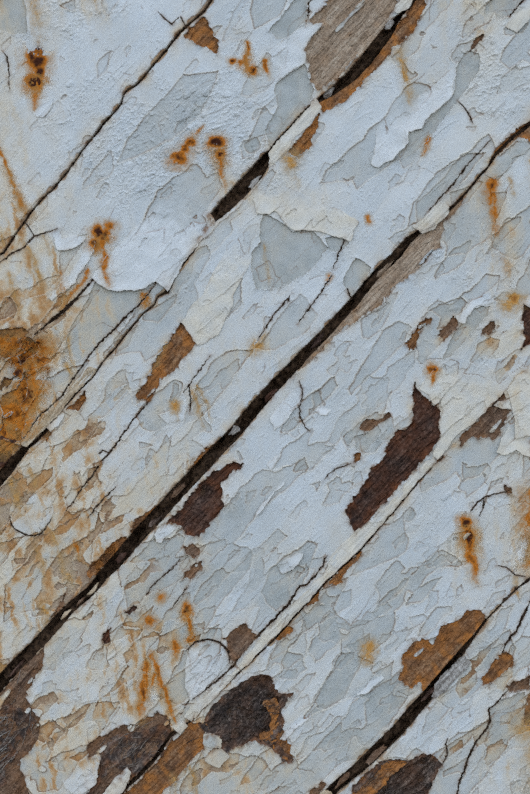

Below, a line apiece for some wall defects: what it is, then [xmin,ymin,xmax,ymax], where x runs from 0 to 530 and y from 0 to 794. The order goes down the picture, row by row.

corrosion [23,49,49,111]
peeling [255,0,426,156]
corrosion [88,221,115,285]
corrosion [0,334,55,454]
crack [10,402,148,537]
crack [27,279,157,433]
peeling [154,462,244,579]
crack [185,557,326,705]
peeling [345,292,530,531]
corrosion [457,515,480,580]
crack [501,566,530,653]
peeling [0,647,44,794]